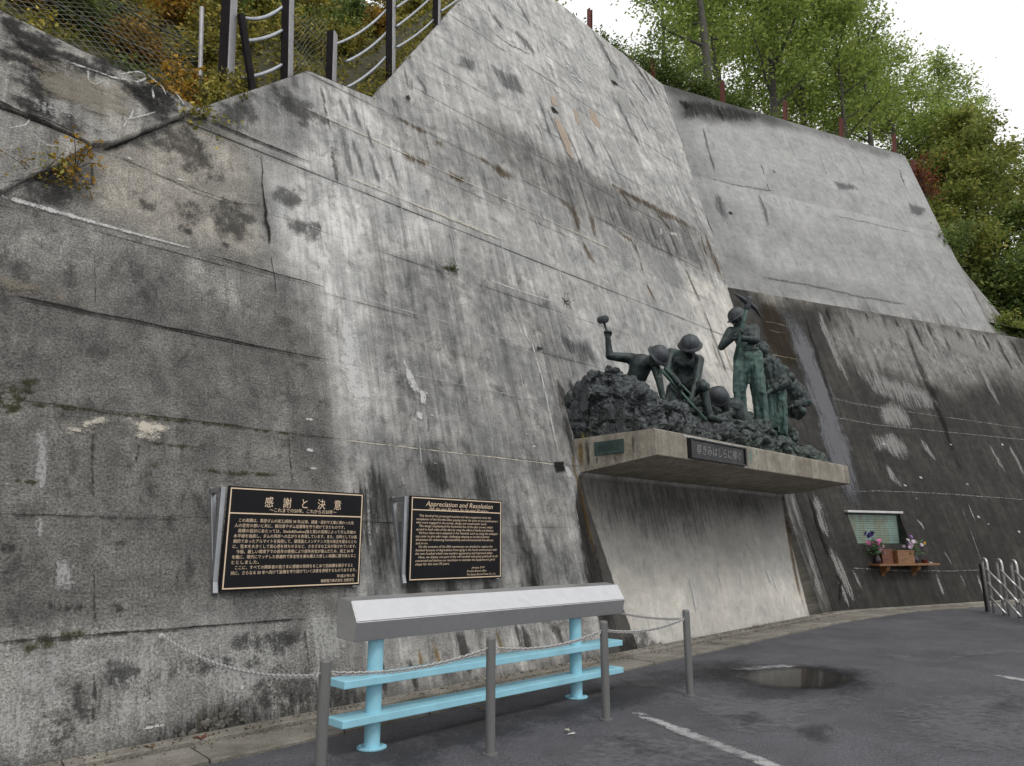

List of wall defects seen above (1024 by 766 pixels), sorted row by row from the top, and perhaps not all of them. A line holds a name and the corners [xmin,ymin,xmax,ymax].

crack [0,57,323,293]